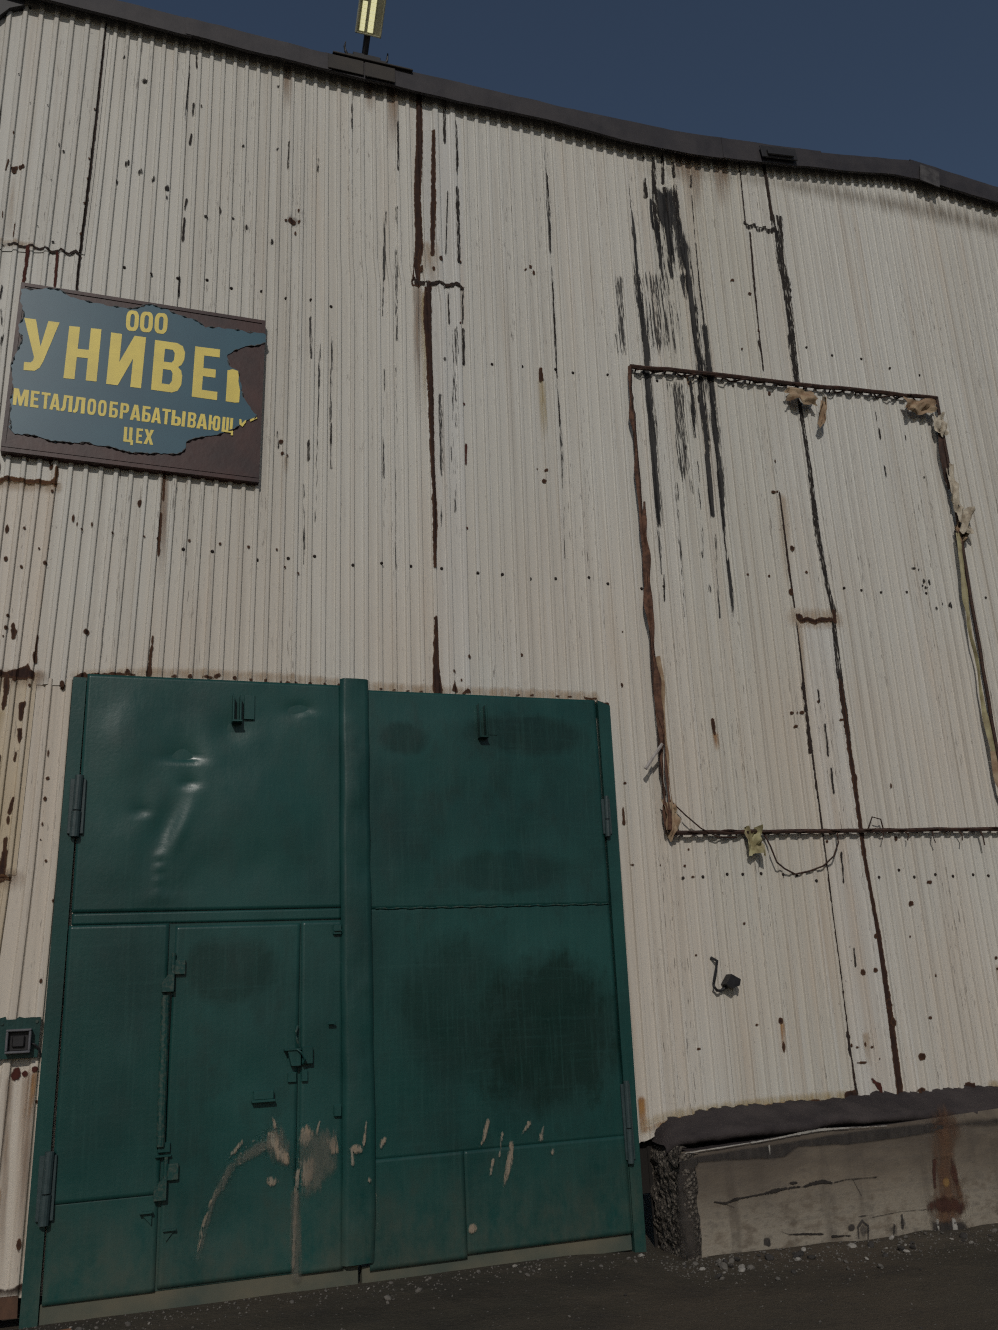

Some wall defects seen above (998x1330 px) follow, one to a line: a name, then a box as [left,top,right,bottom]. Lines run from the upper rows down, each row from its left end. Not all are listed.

corrosion [411,244,443,347]
corrosion [0,635,40,761]
corrosion [0,797,14,882]
corrosion [11,1066,38,1167]
corrosion [928,1112,966,1231]
corrosion [0,1283,22,1294]